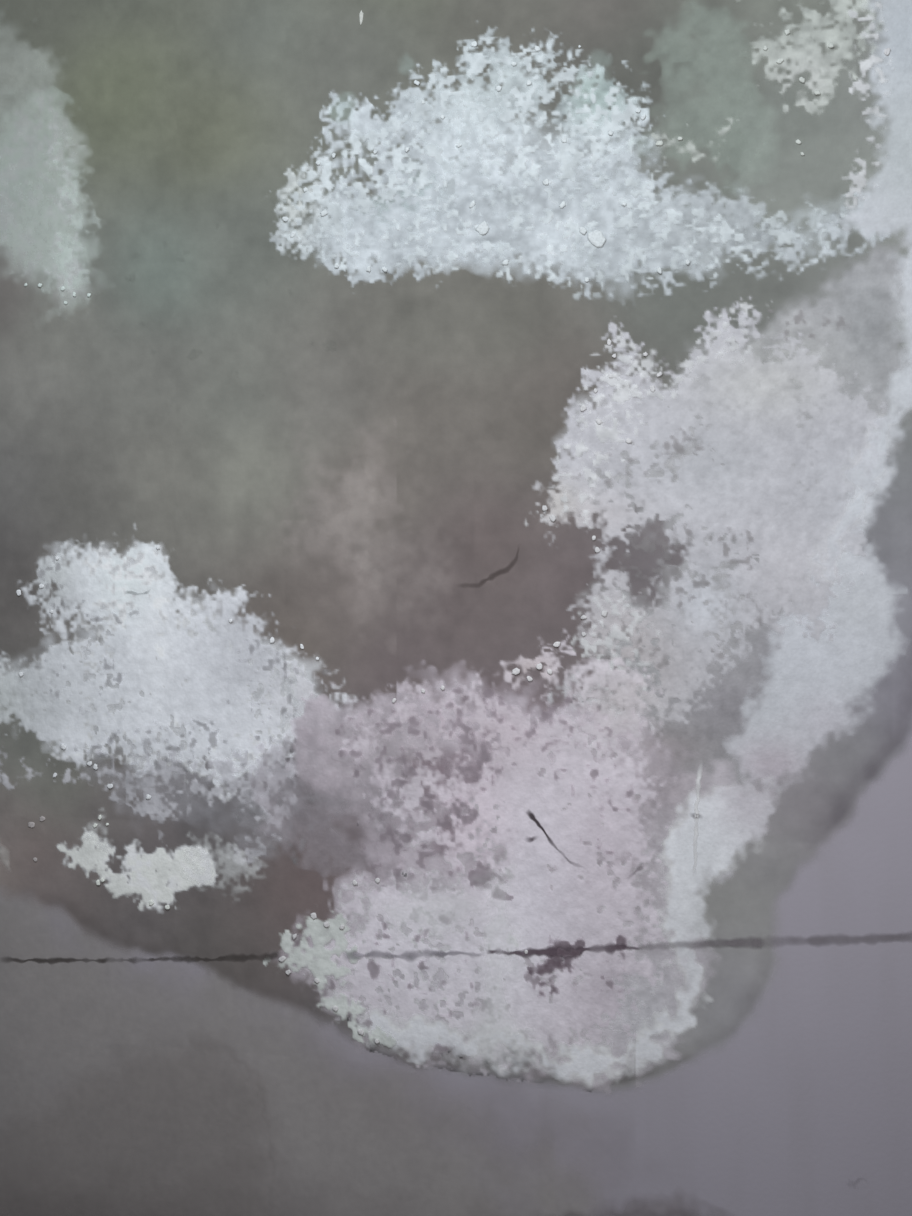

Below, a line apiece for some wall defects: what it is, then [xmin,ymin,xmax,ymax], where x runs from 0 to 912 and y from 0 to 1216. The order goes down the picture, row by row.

leakage [875,230,909,258]
leakage [361,408,912,1091]
crack [705,938,762,946]
crack [810,936,827,944]
crack [867,933,907,941]
crack [11,956,106,964]
crack [149,953,277,961]
leakage [0,714,593,1216]
crack [490,935,638,994]
spalling [613,1198,700,1216]